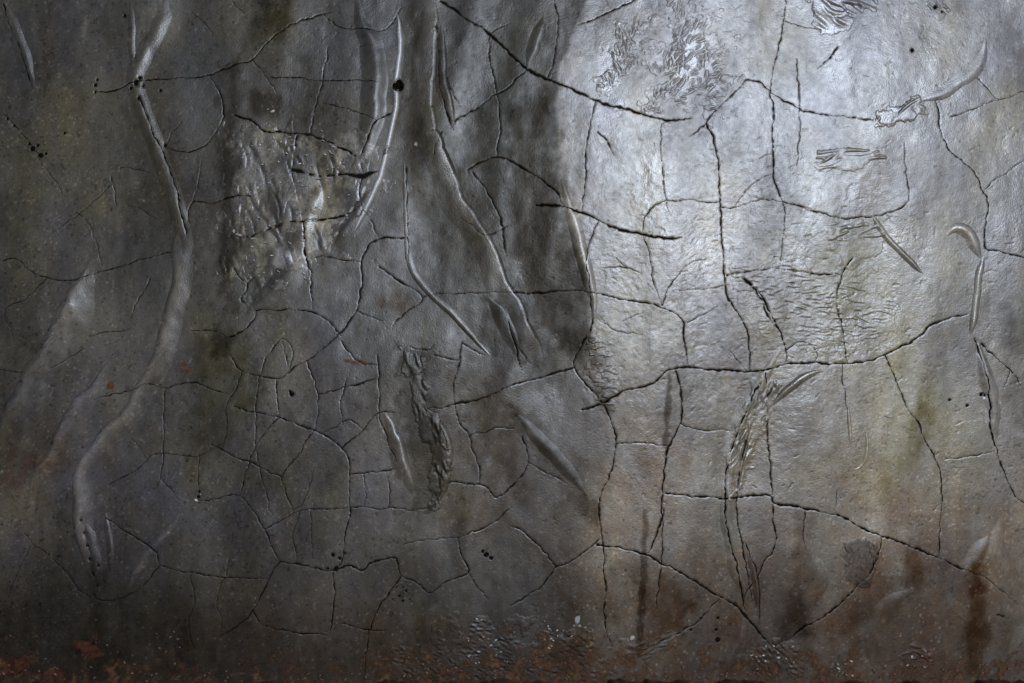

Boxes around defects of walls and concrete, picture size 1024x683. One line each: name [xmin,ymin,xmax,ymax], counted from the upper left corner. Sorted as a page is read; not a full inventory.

crack [2,3,509,665]
crack [379,0,1024,647]